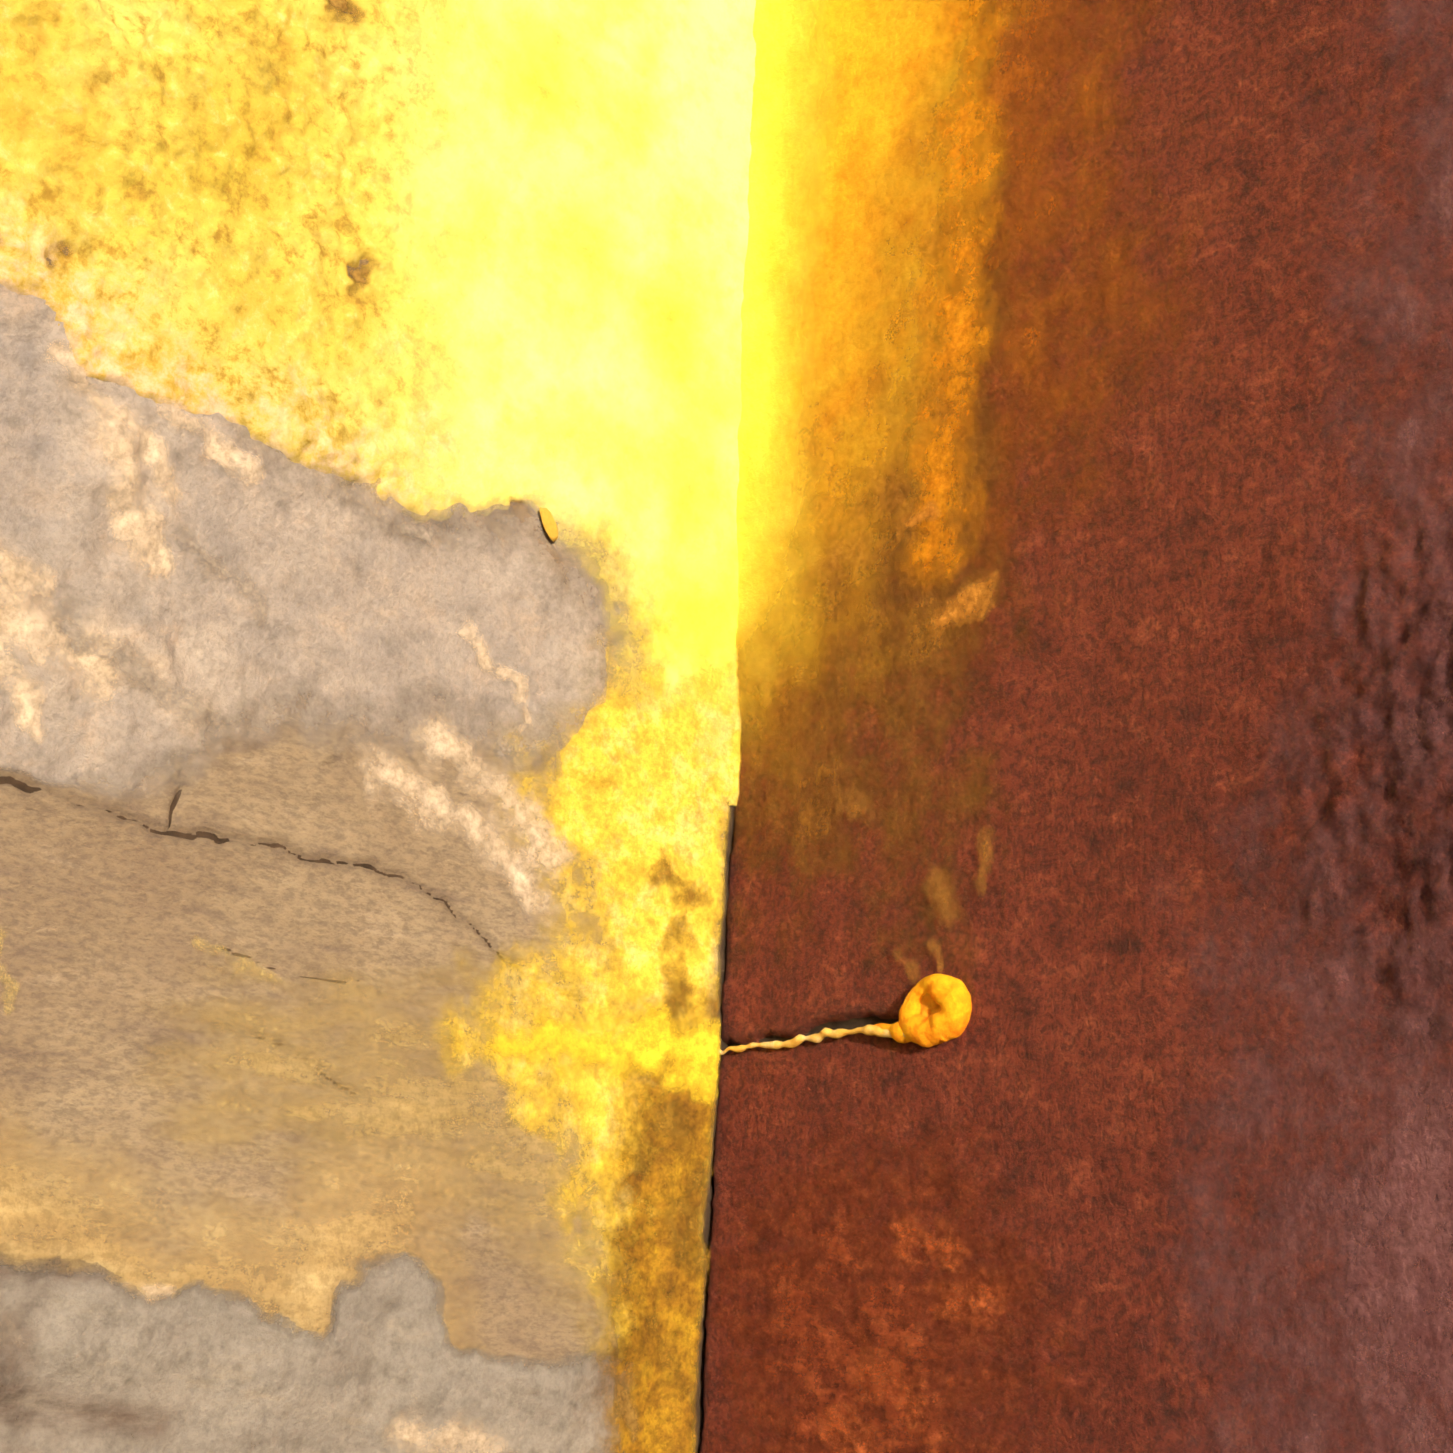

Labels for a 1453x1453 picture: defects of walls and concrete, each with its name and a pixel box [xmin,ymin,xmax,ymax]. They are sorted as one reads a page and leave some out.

spalling [0,284,621,907]
corrosion [933,576,995,631]
crack [0,776,41,793]
crack [77,789,531,984]
crack [691,802,905,1453]
peeling [0,1253,627,1453]